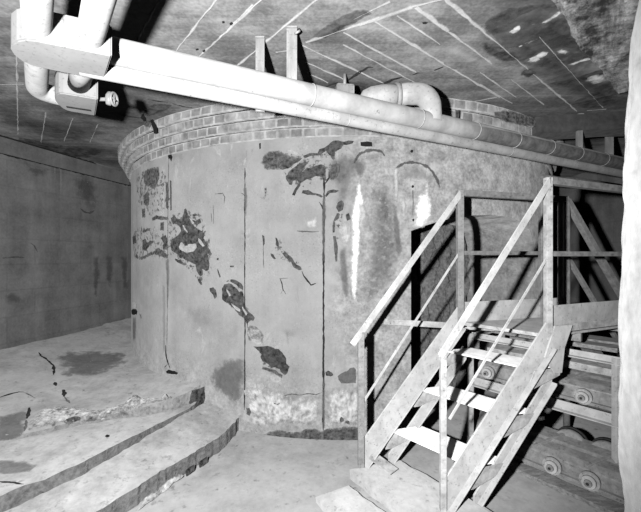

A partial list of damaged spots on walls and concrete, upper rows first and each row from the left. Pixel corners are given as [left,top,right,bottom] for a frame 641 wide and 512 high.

damp [484,5,617,108]
spalling [262,140,372,196]
spalling [132,167,219,285]
damp [339,183,366,299]
damp [370,168,431,294]
spalling [209,269,289,382]
crack [38,352,70,403]
damp [61,352,125,374]
spalling [29,394,172,430]
damp [214,361,243,399]
peeling [244,368,358,440]